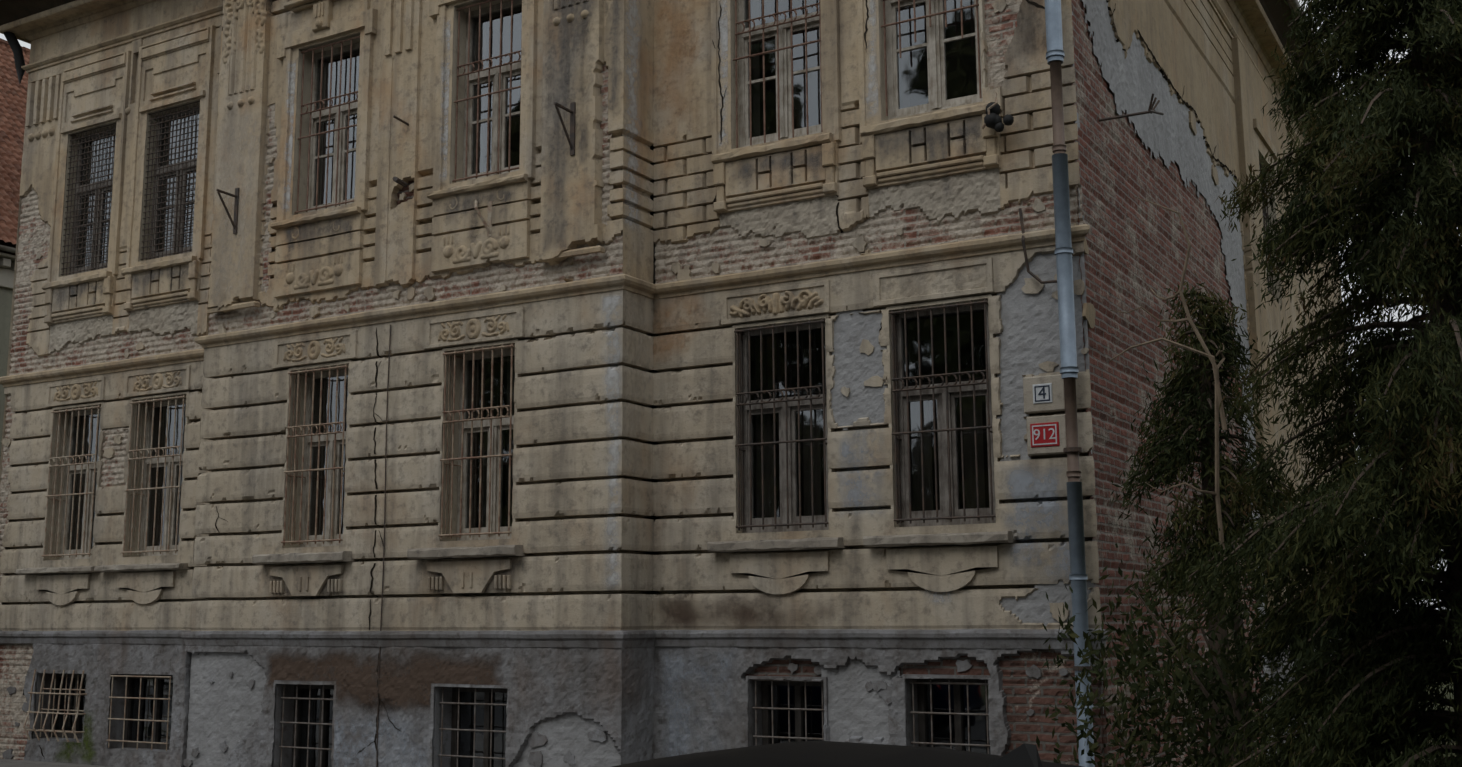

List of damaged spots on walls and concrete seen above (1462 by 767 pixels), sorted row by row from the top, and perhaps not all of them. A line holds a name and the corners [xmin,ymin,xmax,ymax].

flaking render [8,64,623,376]
flaking render [0,395,15,584]
flaking render [99,427,129,487]
peeling [603,296,619,584]
flaking render [655,0,1256,767]
flaking render [0,643,34,760]
flaking render [183,653,267,767]
flaking render [512,714,621,767]
flaking render [1229,499,1275,767]